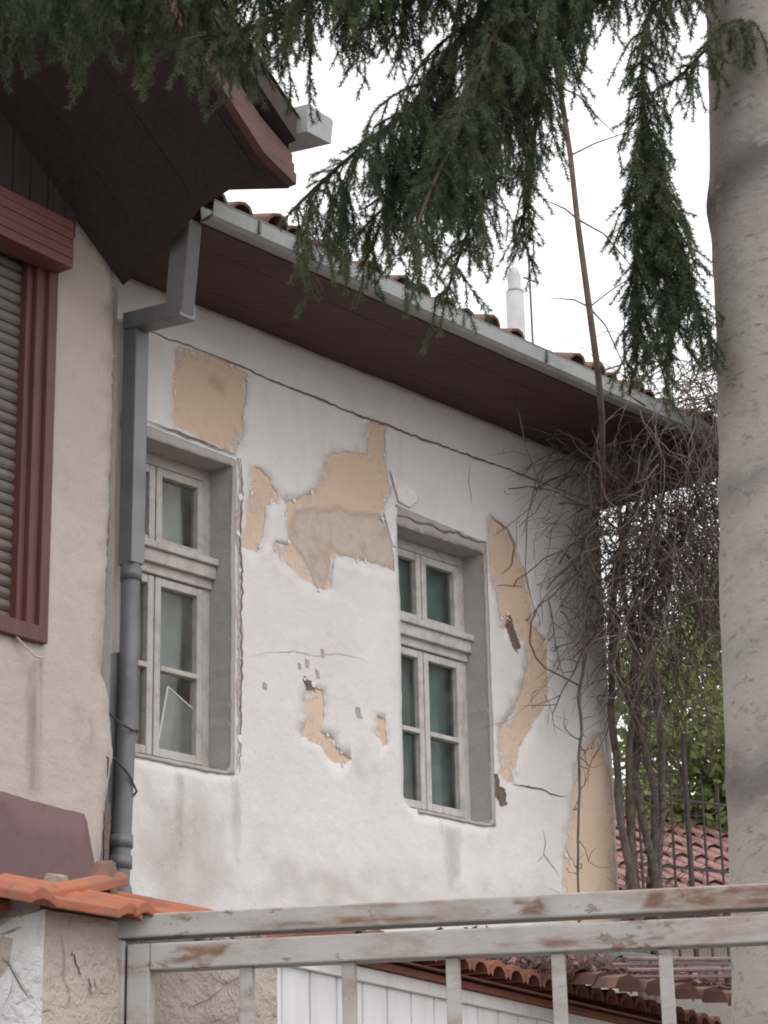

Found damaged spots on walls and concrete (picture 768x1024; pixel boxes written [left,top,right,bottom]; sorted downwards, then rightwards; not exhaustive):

flaking render [172,347,418,774]
crack [147,332,585,587]
flaking render [489,518,550,806]
crack [515,784,562,797]
flaking render [563,732,617,893]